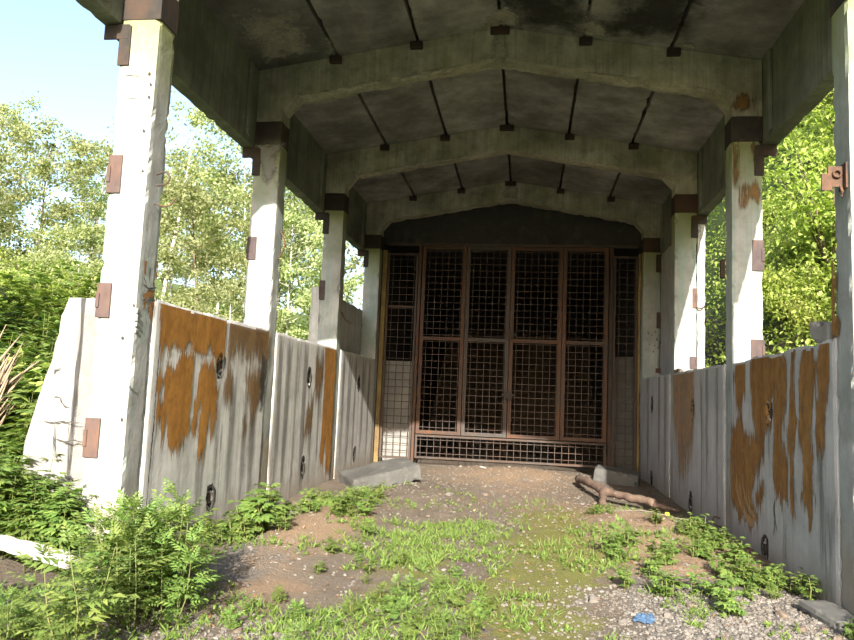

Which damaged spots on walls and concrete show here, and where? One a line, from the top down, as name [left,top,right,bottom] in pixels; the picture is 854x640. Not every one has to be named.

efflorescence [485,7,516,29]
corrosion [733,140,760,208]
corrosion [156,303,270,466]
corrosion [303,347,337,476]
corrosion [672,372,694,486]
corrosion [730,259,840,533]